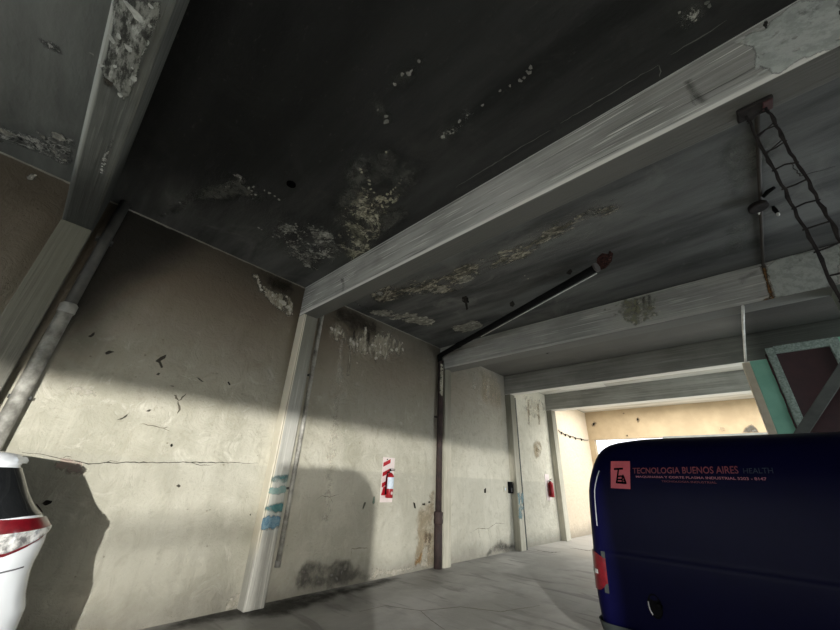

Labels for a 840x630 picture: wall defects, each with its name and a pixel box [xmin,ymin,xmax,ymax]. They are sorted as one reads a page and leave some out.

spalling [89,0,160,100]
peeling [0,128,73,164]
peeling [253,275,293,315]
peeling [368,205,619,326]
corrosion [760,266,775,301]
peeling [451,321,483,333]
crack [22,452,251,465]
leakage [173,561,391,627]